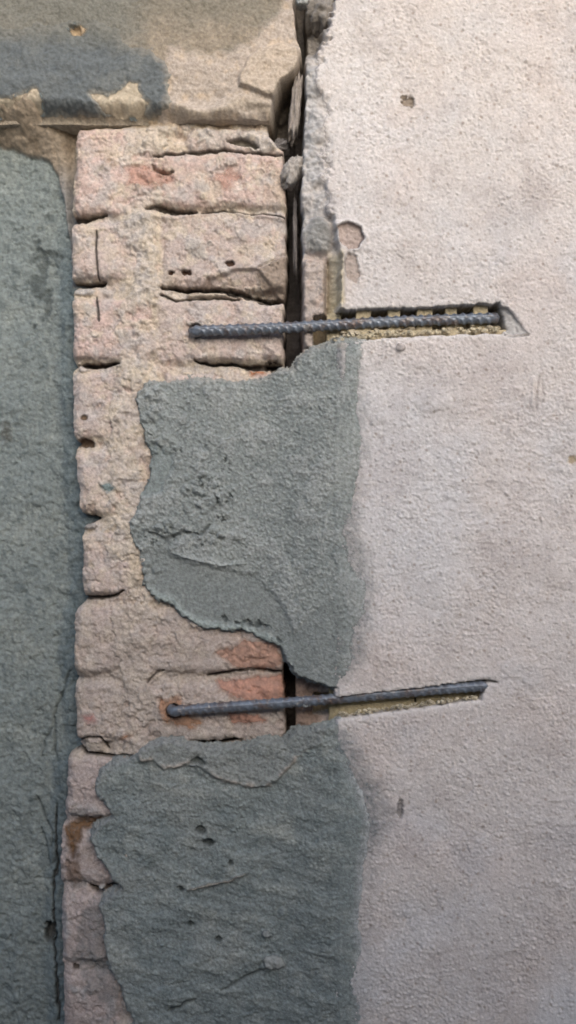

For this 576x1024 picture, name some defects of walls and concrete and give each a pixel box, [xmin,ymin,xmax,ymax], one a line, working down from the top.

spalling [129,165,172,185]
spalling [227,140,259,150]
spalling [296,54,364,283]
spalling [257,257,289,306]
spalling [80,438,95,448]
crack [46,807,61,1019]